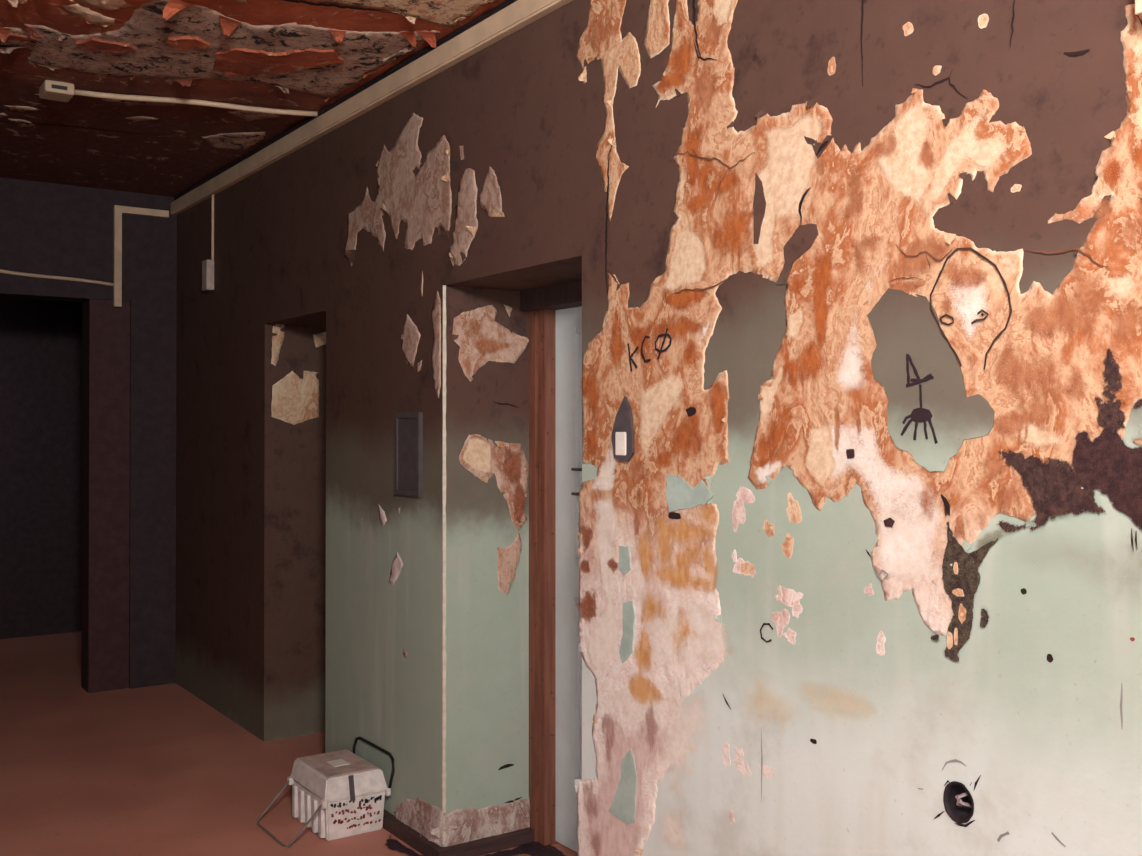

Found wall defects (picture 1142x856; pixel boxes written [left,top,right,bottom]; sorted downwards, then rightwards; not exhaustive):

peeling [0,0,495,102]
peeling [0,94,41,128]
peeling [344,112,505,266]
peeling [271,324,285,366]
peeling [313,332,326,347]
peeling [271,369,320,425]
peeling [574,0,1142,856]
peeling [459,434,529,595]
spalling [394,797,530,847]